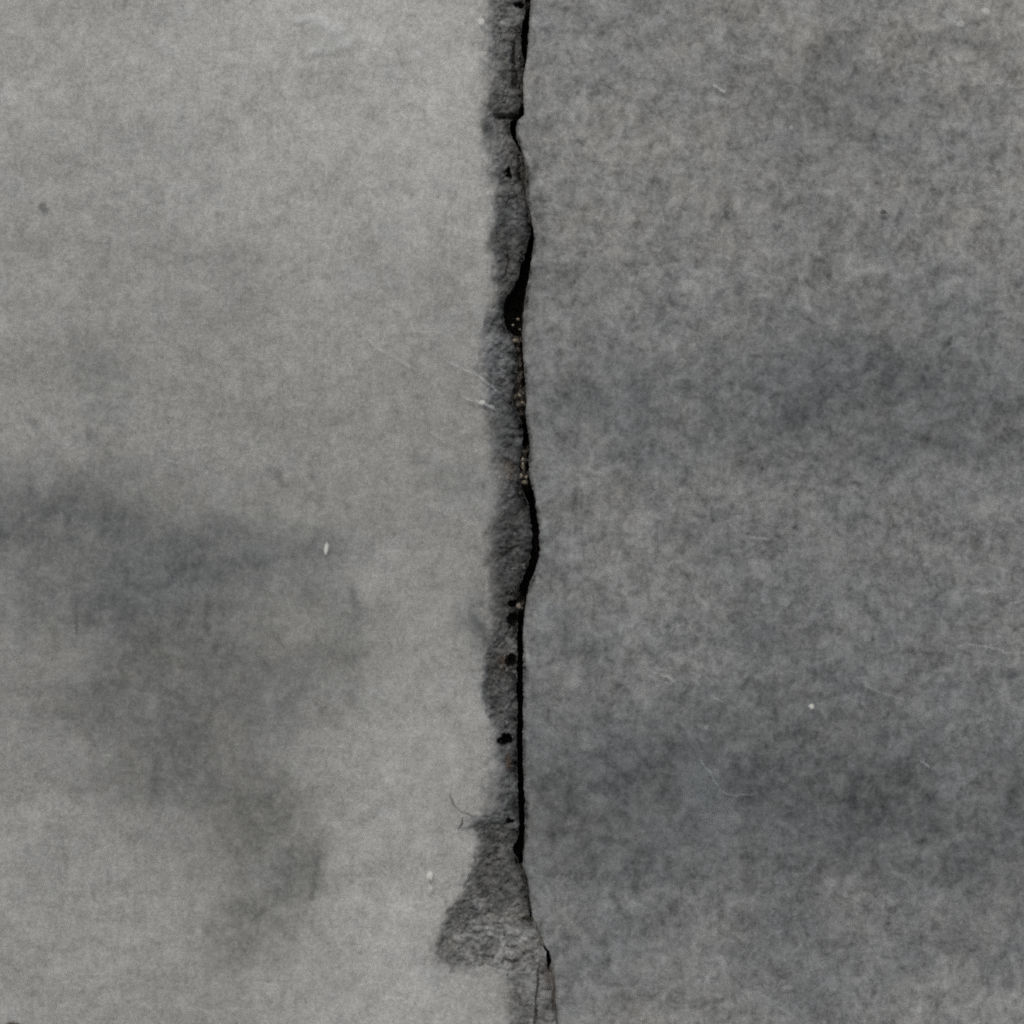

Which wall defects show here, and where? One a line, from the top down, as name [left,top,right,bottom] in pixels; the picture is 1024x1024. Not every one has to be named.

spalling [425,0,557,1024]
crack [495,0,558,1024]